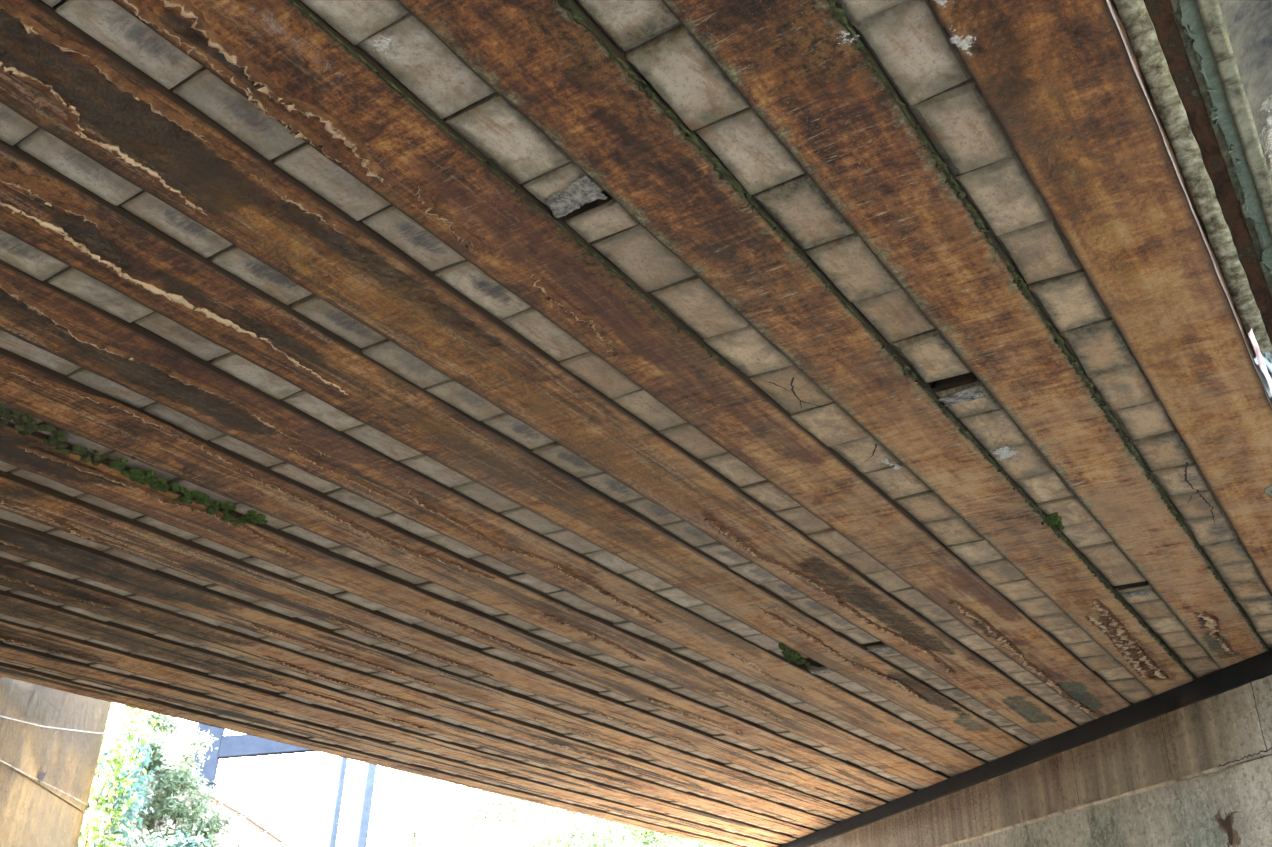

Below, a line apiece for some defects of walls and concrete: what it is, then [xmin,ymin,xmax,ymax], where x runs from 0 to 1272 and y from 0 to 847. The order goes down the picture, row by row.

damp [934,0,1027,102]
damp [1259,94,1272,176]
spalling [546,176,612,220]
spalling [932,371,985,407]